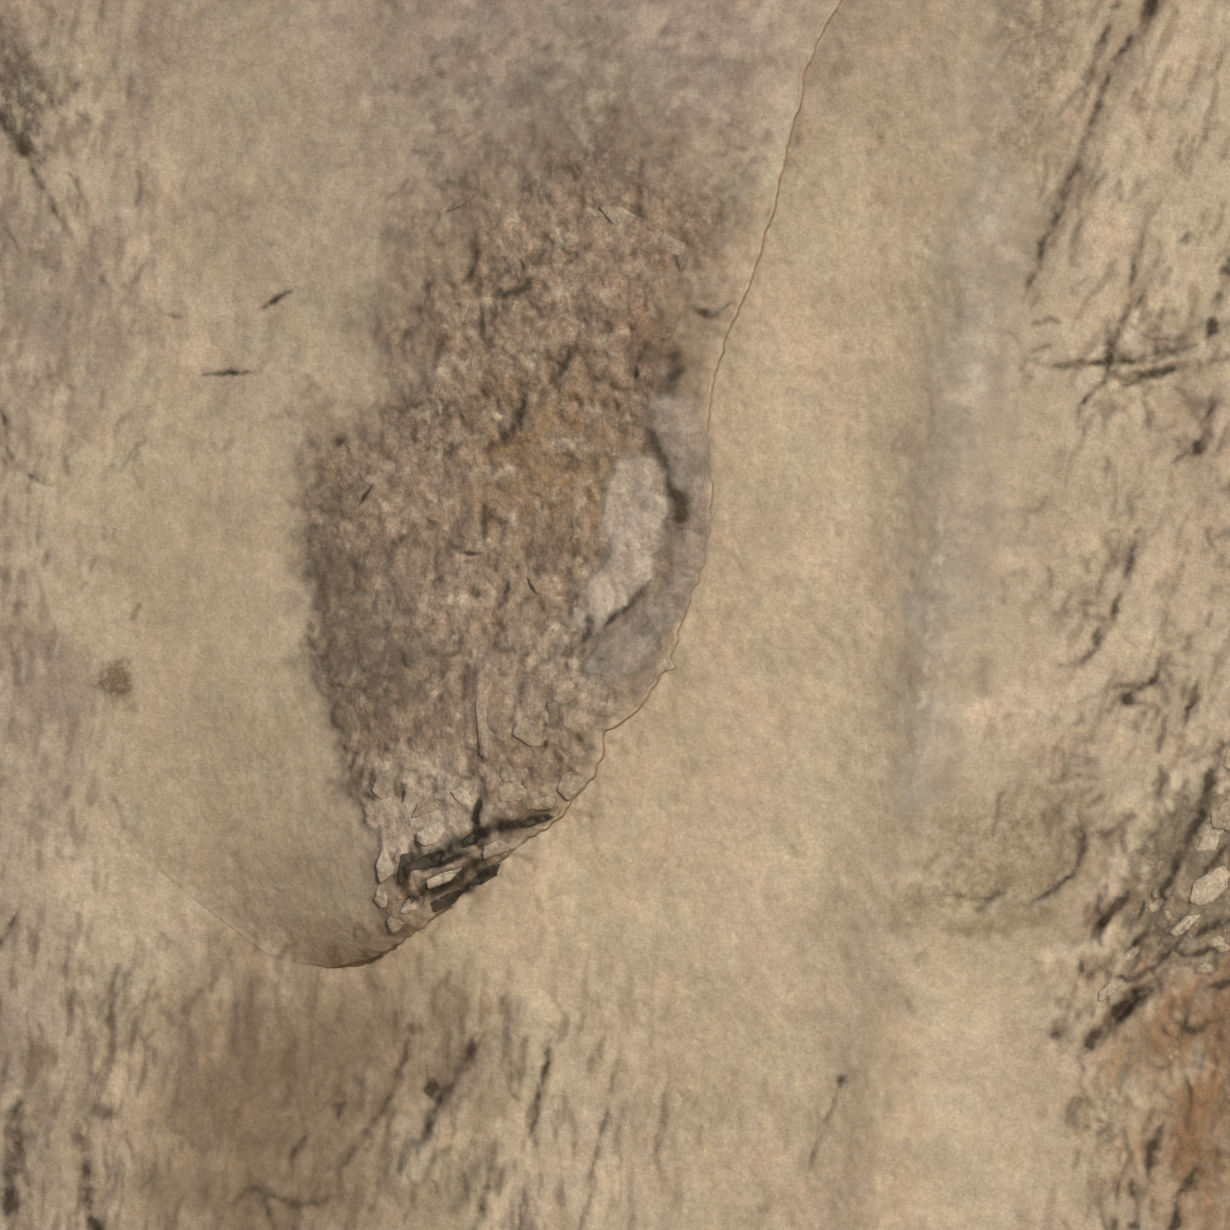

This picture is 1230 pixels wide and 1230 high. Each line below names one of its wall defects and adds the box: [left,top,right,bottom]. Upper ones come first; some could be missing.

crack [1065,264,1177,403]
crack [1207,261,1230,337]
peeling [52,0,842,968]
peeling [1084,750,1230,1050]